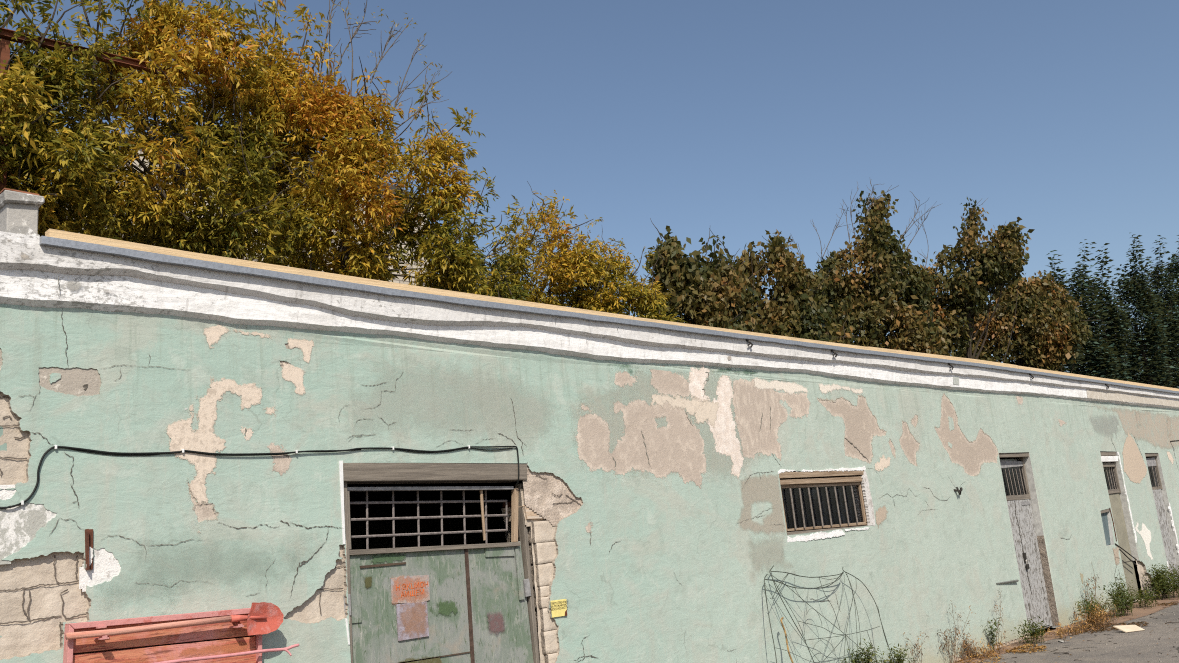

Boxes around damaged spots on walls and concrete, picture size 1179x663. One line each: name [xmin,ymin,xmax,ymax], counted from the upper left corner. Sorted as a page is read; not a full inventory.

spalling [0,393,121,659]
flaking render [38,367,101,396]
crack [22,385,341,595]
peeling [167,376,276,533]
peeling [280,338,314,396]
spalling [284,543,350,624]
crack [338,372,403,441]
spalling [501,469,582,663]
flaking render [575,364,920,533]
flaking render [934,394,998,477]
peeling [1086,389,1179,484]